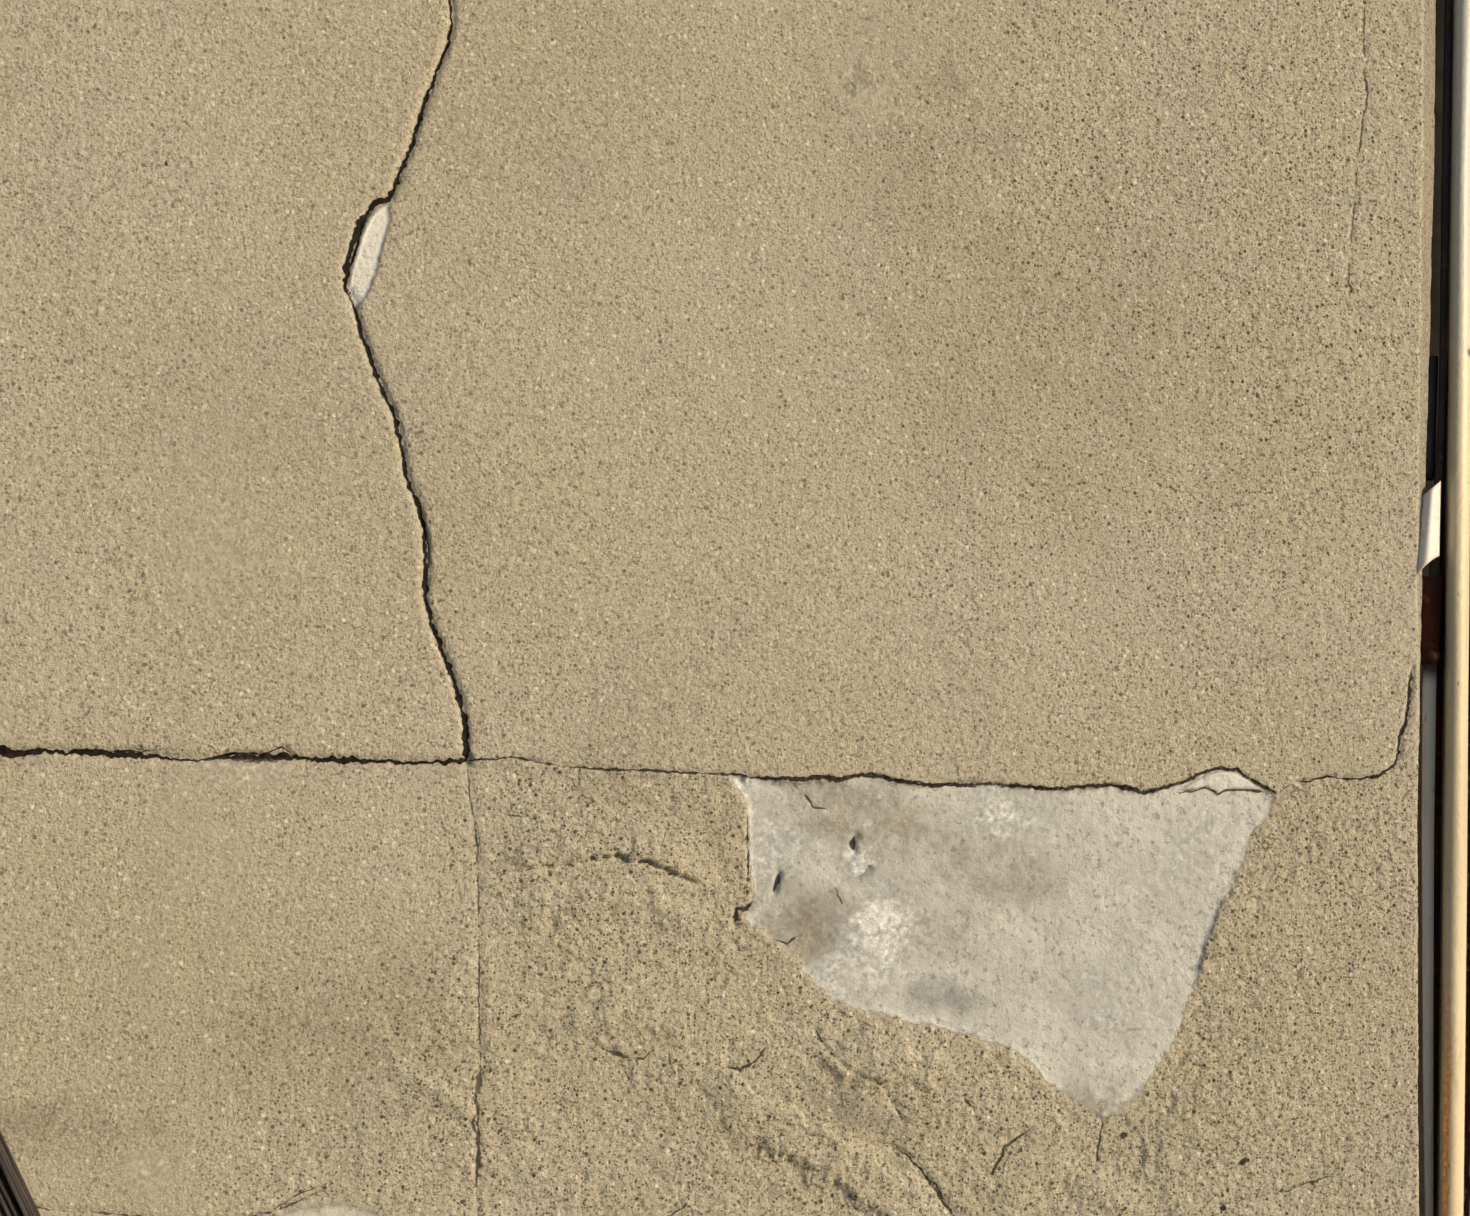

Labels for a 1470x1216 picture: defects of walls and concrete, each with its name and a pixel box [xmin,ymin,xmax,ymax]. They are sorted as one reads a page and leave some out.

crack [1348,0,1369,294]
spalling [349,204,391,308]
crack [0,0,732,1209]
crack [1279,670,1413,794]
crack [733,817,752,922]
flaking render [729,766,1277,1117]
crack [727,1047,766,1072]
crack [36,1206,142,1216]
crack [252,1187,324,1216]
flaking render [285,1203,378,1216]